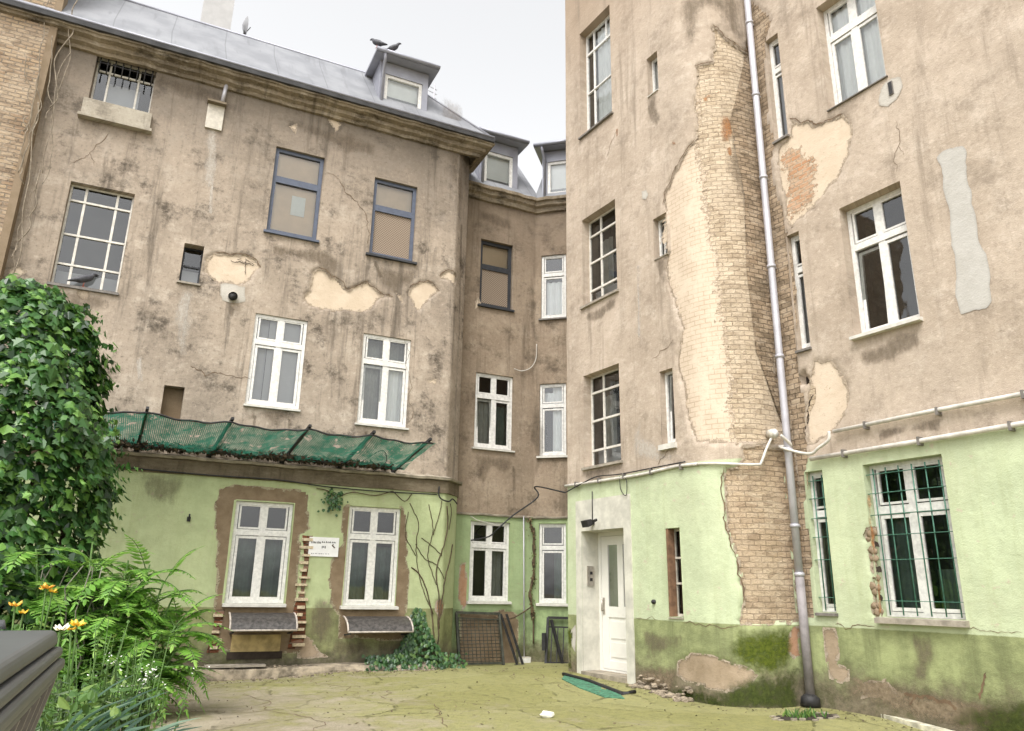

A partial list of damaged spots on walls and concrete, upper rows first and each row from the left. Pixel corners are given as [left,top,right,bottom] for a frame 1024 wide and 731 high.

peeling [204,252,261,285]
peeling [304,267,456,312]
flaking render [664,2,853,659]
water stain [641,669,676,691]
spalling [676,652,758,693]
peeling [822,627,850,684]